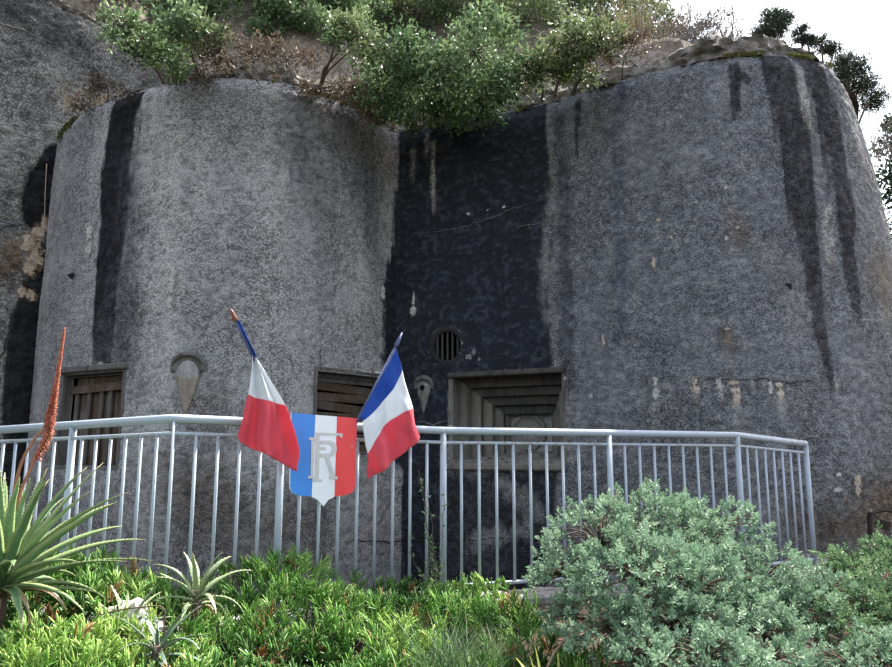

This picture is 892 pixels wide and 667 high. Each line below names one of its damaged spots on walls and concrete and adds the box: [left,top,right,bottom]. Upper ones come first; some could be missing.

leakage [1,245,46,503]
leakage [21,143,58,233]
leakage [92,91,149,364]
leakage [382,98,581,596]
spalling [652,377,661,407]
spalling [716,379,741,412]
spalling [767,381,785,403]
leakage [761,55,861,381]